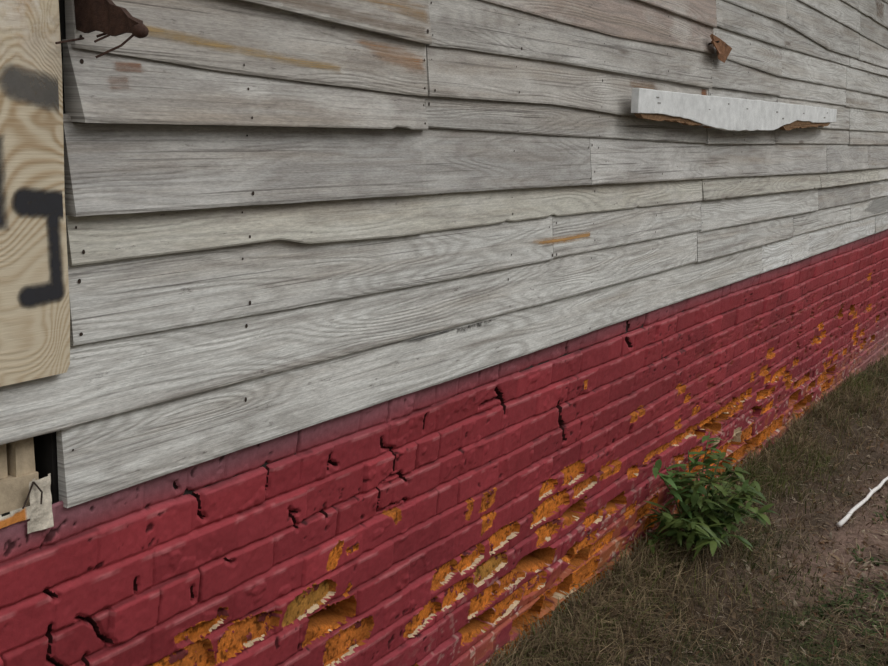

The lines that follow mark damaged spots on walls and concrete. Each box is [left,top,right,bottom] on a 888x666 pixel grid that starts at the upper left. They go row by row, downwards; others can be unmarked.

crack [481,387,506,414]
crack [556,400,567,442]
spalling [0,473,54,534]
crack [173,481,205,519]
crack [288,510,298,528]
crack [327,454,338,470]
crack [376,436,407,510]
spalling [403,303,880,666]
crack [43,589,58,598]
spalling [147,540,359,666]
crack [45,615,114,666]
spalling [323,616,375,666]